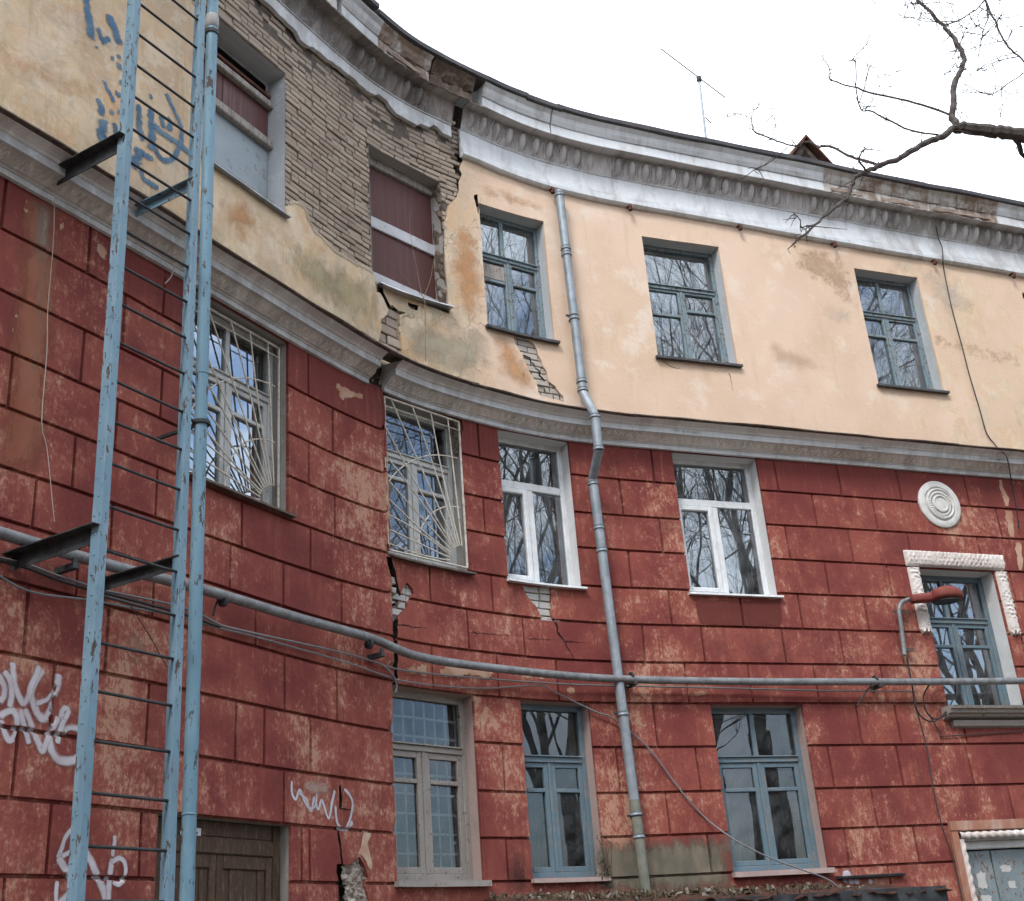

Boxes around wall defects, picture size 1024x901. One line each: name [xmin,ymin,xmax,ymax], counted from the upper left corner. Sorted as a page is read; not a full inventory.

spalling [191,0,460,311]
crack [447,121,459,188]
peeling [881,197,917,206]
peeling [932,207,991,219]
spalling [379,307,401,353]
spalling [514,336,563,401]
spalling [523,586,571,622]
crack [471,619,588,658]
spalling [341,830,372,901]